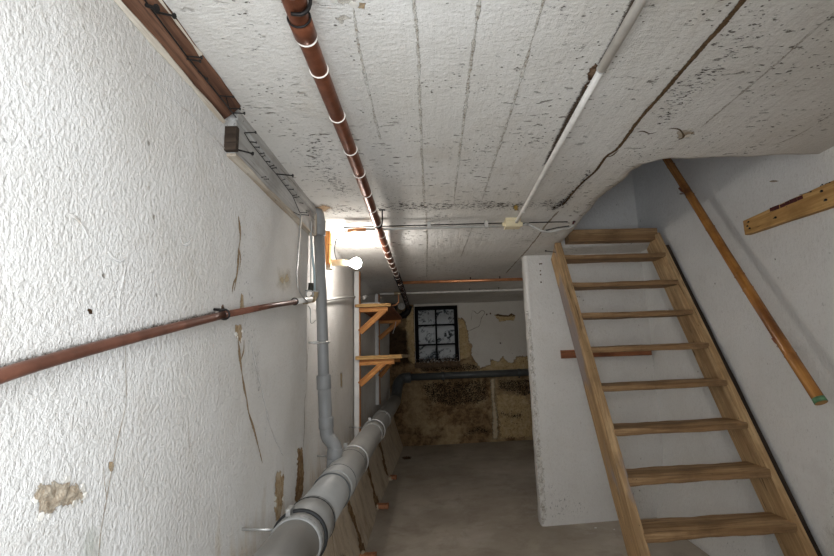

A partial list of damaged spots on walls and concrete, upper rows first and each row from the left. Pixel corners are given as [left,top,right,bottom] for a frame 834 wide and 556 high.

crack [506,0,834,273]
crack [232,216,241,292]
flaking render [32,475,87,521]
crack [98,350,127,556]
crack [238,340,262,461]
flaking render [274,470,284,522]
flaking render [389,305,546,524]
damp [420,362,530,439]